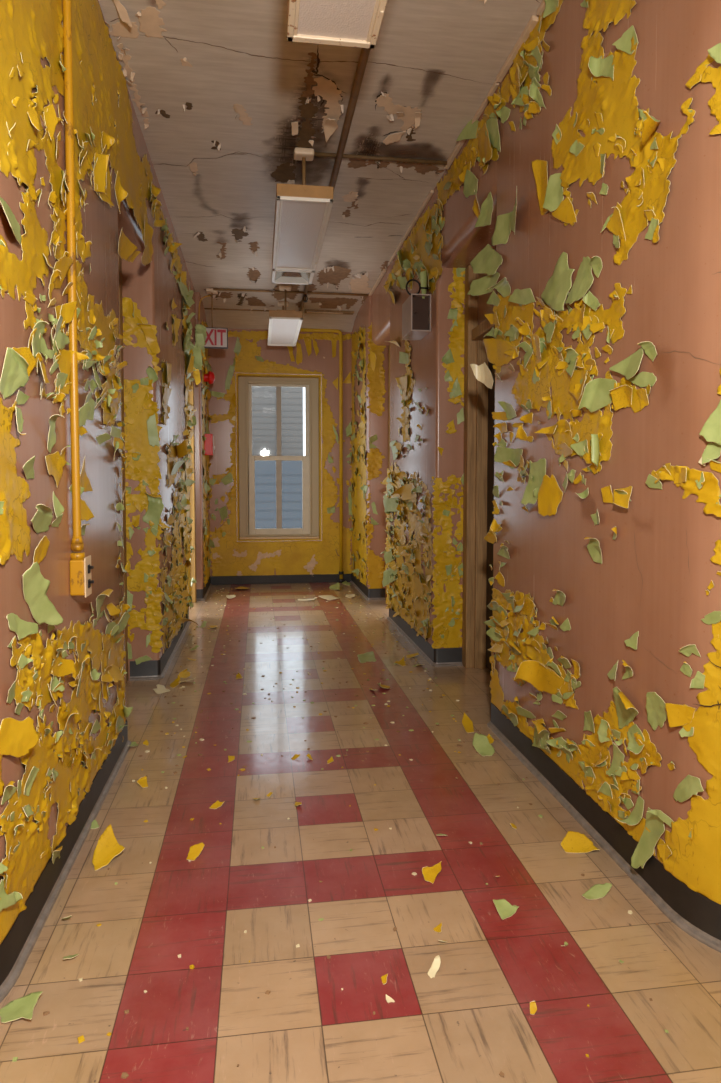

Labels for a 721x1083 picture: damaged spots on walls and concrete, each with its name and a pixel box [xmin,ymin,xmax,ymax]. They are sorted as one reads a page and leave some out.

crack [163,36,489,120]
damp [278,85,330,183]
damp [354,132,442,160]
peeling [0,0,464,944]
peeling [347,0,721,905]